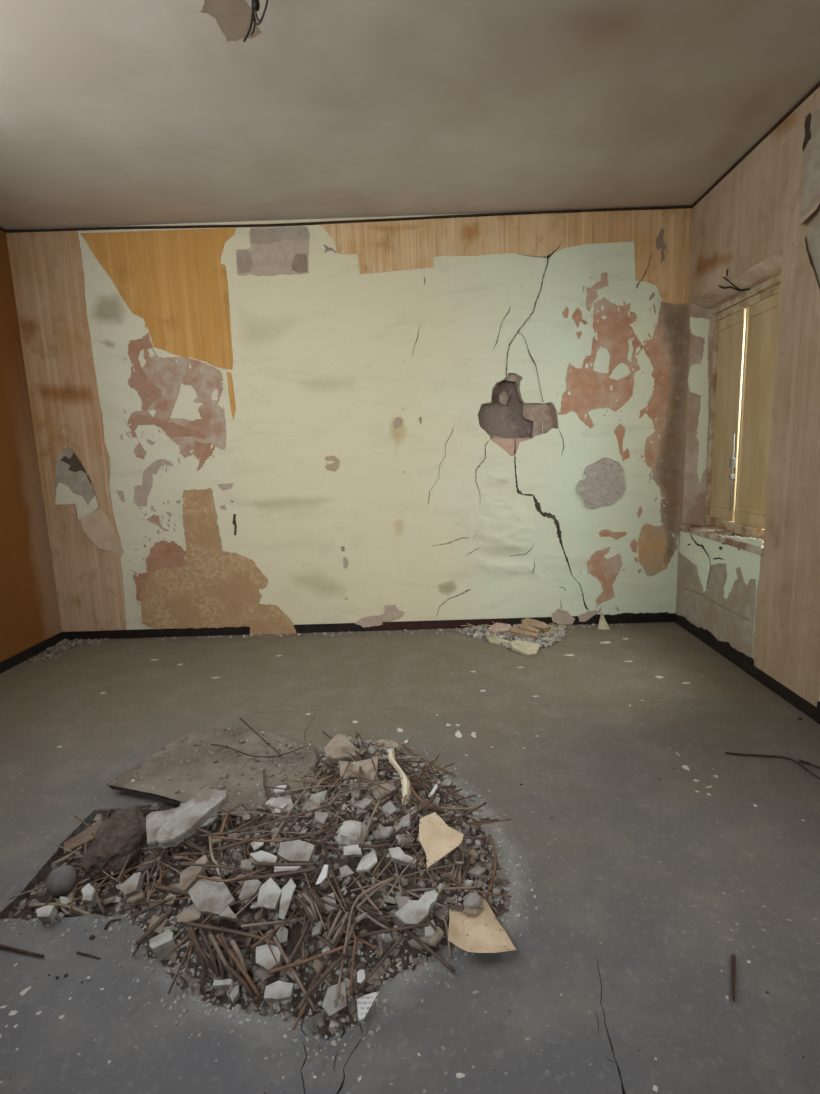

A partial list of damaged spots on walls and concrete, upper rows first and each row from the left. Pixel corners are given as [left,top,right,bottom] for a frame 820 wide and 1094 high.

spalling [200,0,261,42]
spalling [236,226,310,276]
spalling [656,229,667,264]
crack [494,242,562,402]
flaking render [54,447,99,510]
spalling [117,324,296,635]
crack [511,439,589,611]
peeling [478,272,763,658]
crack [300,1018,369,1094]
crack [595,960,626,1094]